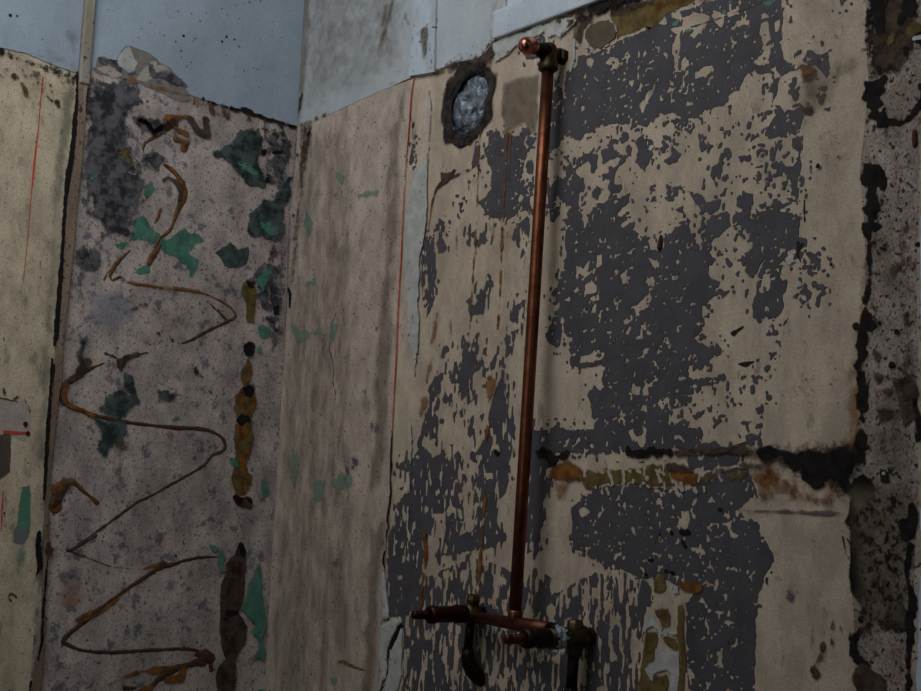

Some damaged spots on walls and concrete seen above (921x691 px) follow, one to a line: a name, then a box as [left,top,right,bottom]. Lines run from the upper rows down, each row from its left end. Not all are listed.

water stain [0,48,76,172]
water stain [861,75,921,133]
water stain [75,78,169,285]
peeling [421,218,450,318]
peeling [455,194,497,249]
peeling [466,273,494,321]
peeling [601,77,827,336]
peeling [0,388,31,479]
peeling [439,293,526,448]
peeling [526,418,558,560]
water stain [582,163,921,691]
peeling [376,520,511,691]